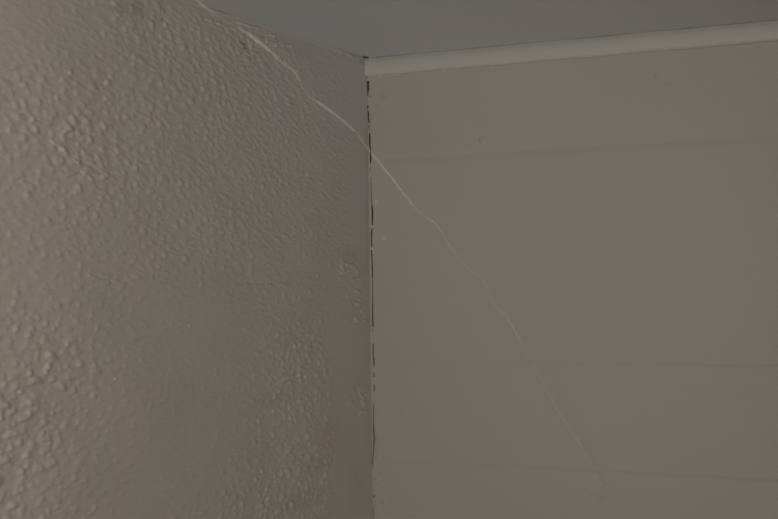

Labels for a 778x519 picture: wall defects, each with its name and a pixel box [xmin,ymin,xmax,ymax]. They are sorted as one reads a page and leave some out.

crack [365,77,373,172]
crack [369,191,377,467]